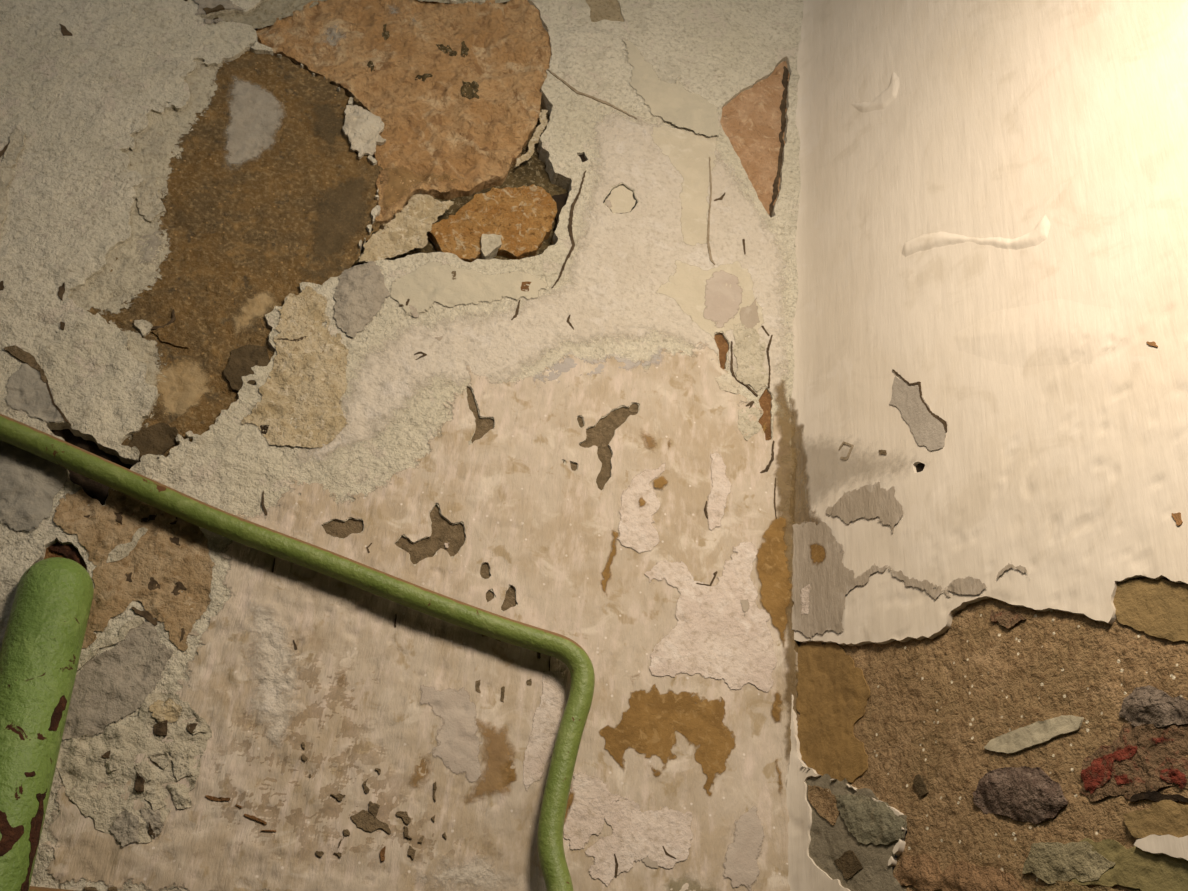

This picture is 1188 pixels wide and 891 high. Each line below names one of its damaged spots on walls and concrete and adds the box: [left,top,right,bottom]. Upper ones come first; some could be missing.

flaking render [585,0,624,22]
crack [0,127,26,237]
flaking render [4,0,569,469]
crack [551,170,586,288]
crack [547,69,637,120]
flaking render [622,38,790,246]
crack [511,300,520,320]
peeling [237,260,1188,891]
peeling [0,440,571,891]